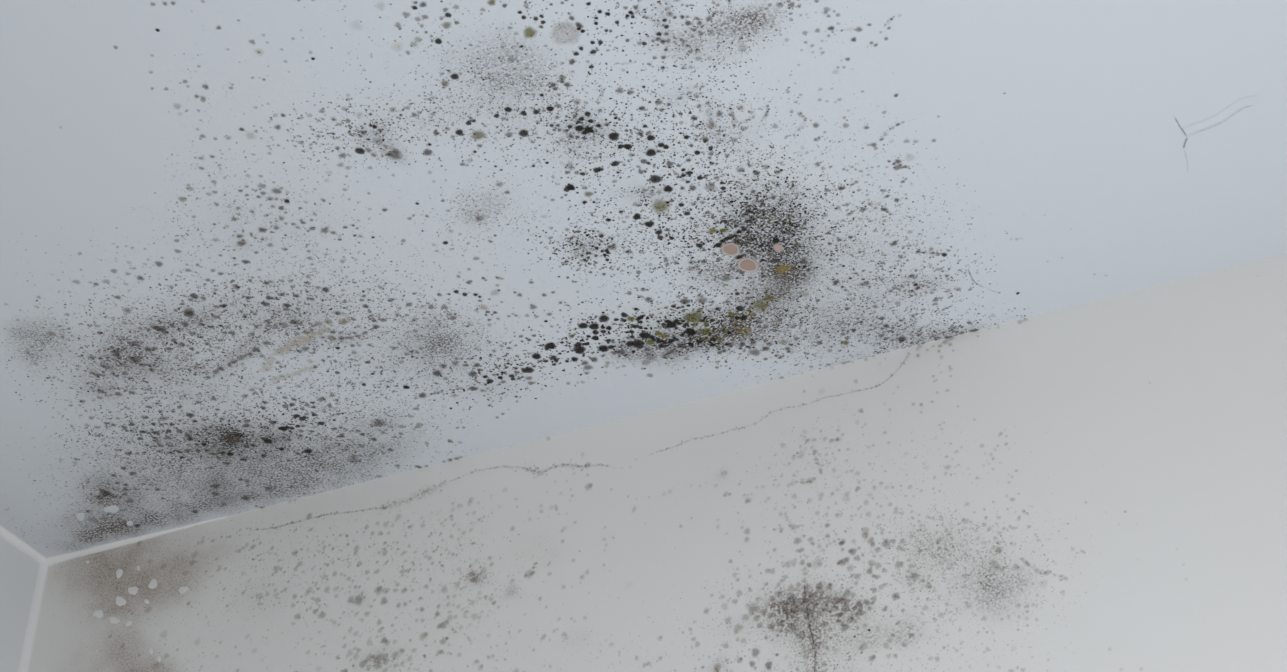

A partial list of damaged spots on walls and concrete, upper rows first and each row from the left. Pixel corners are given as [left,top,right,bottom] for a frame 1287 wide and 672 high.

water stain [2,0,996,626]
water stain [772,596,818,643]